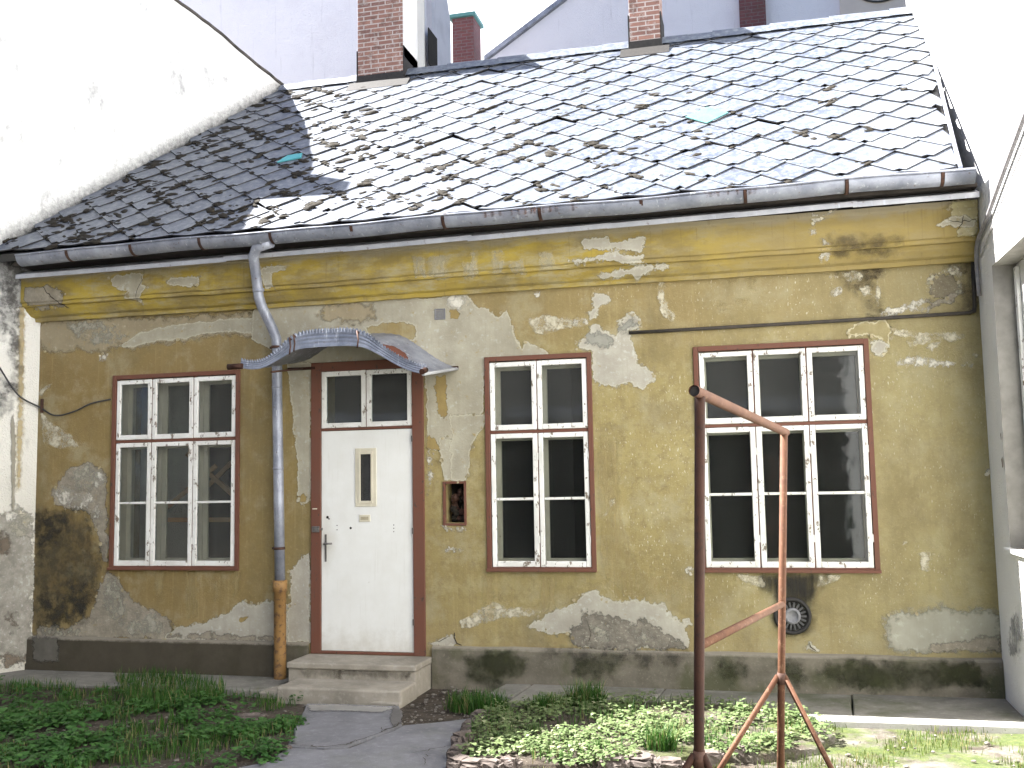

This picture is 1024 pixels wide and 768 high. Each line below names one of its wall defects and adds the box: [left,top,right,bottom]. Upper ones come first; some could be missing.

peeling [568,236,669,280]
water stain [834,237,889,256]
water stain [847,269,930,316]
flaking render [574,293,656,390]
flaking render [24,272,548,507]
water stain [32,514,98,662]
flaking render [0,462,311,668]
flaking render [526,590,693,651]
flaking render [883,603,1021,656]
water stain [465,653,526,687]
water stain [785,663,802,685]
water stain [823,659,988,690]